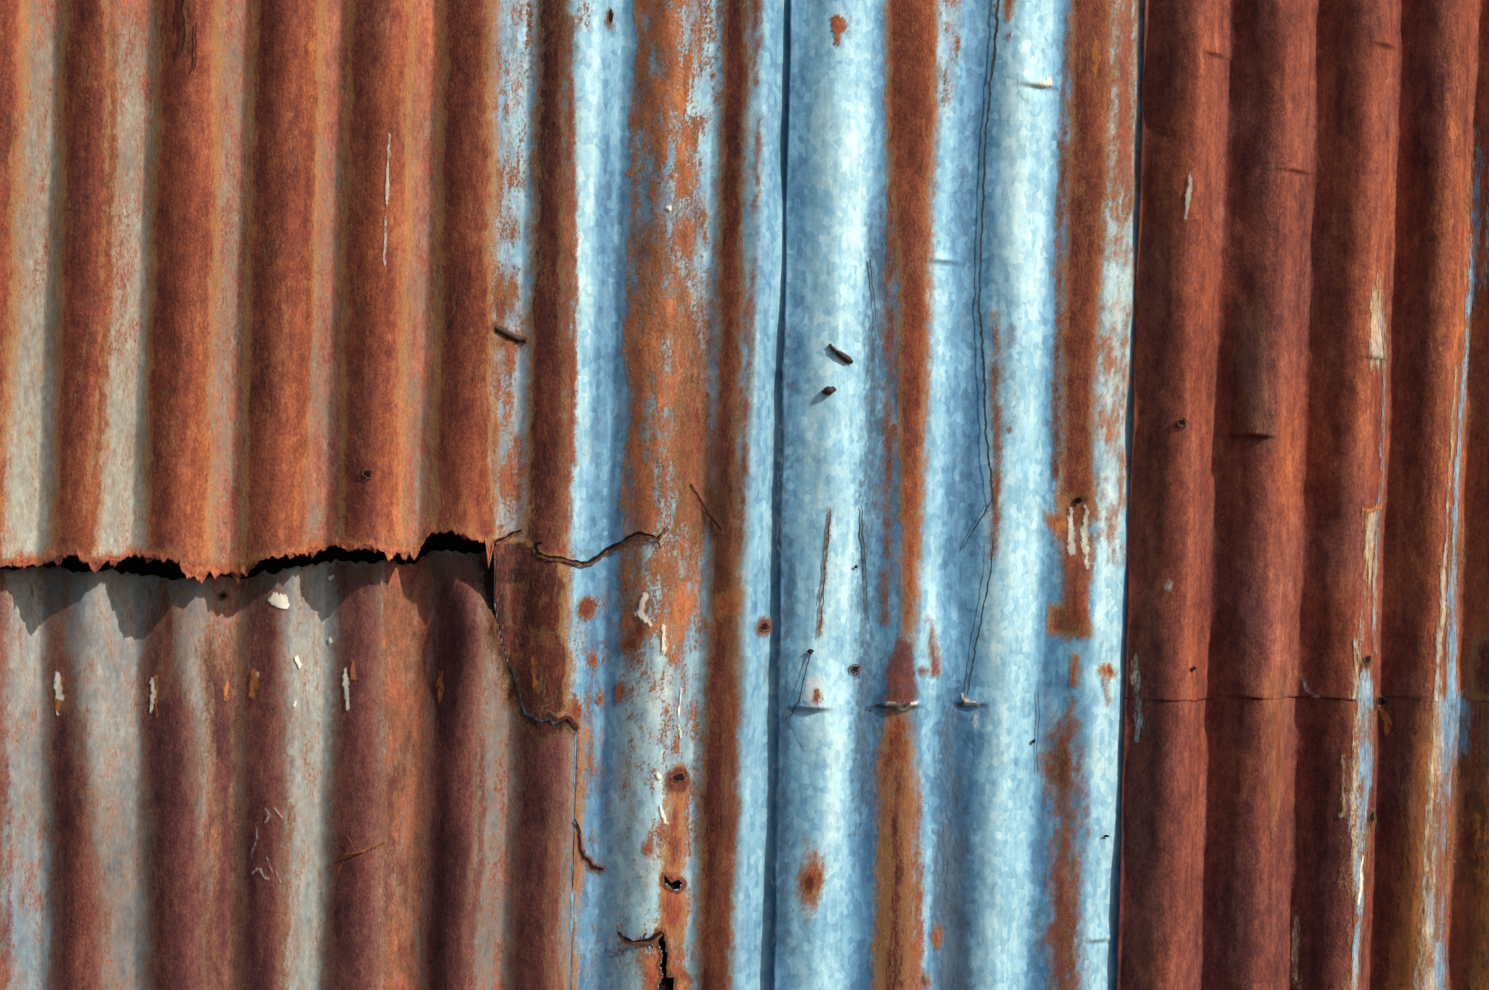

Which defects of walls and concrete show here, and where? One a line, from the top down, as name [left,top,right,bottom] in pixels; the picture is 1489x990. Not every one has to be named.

corrosion [0,0,33,990]
corrosion [43,573,112,990]
corrosion [50,0,121,558]
corrosion [137,0,326,990]
corrosion [320,0,772,990]
crack [545,711,581,730]
corrosion [872,0,962,990]
crack [963,0,1000,695]
corrosion [1038,0,1143,990]
peeling [1338,273,1392,990]
corrosion [1384,25,1489,990]
peeling [1403,127,1489,990]